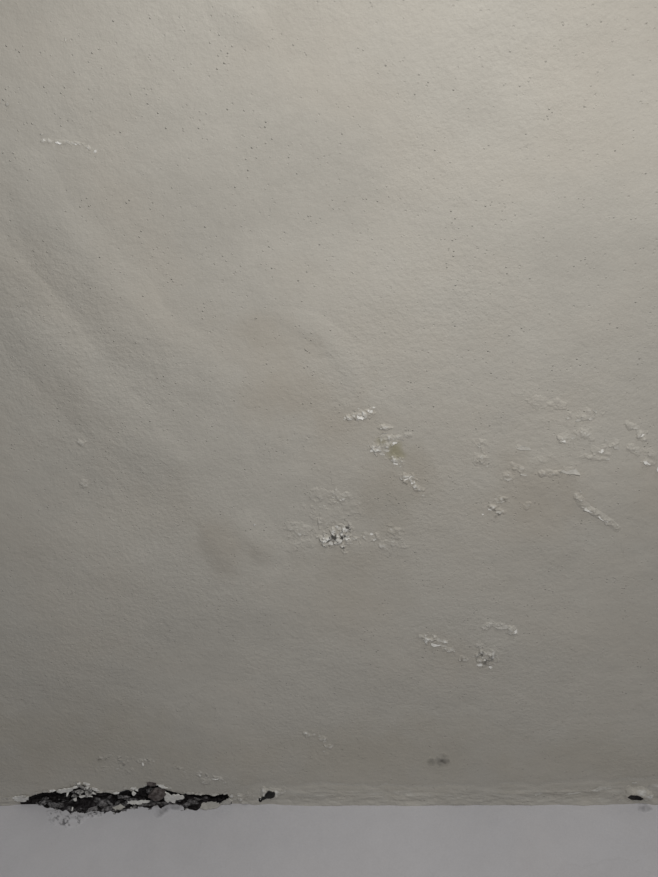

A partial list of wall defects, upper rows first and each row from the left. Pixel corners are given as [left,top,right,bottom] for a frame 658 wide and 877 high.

peeling [343,406,426,496]
peeling [314,517,362,554]
spalling [0,779,658,814]